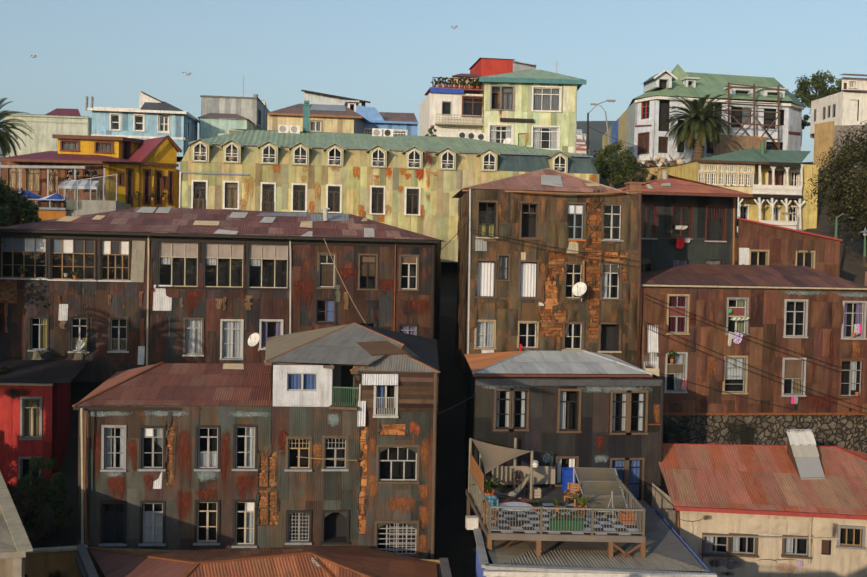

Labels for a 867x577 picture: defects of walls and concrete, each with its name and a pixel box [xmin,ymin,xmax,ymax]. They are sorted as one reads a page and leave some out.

rust [374,151,438,218]
rust [128,439,136,468]
rust [221,433,230,478]
rust [108,476,124,498]
rust [389,485,428,555]